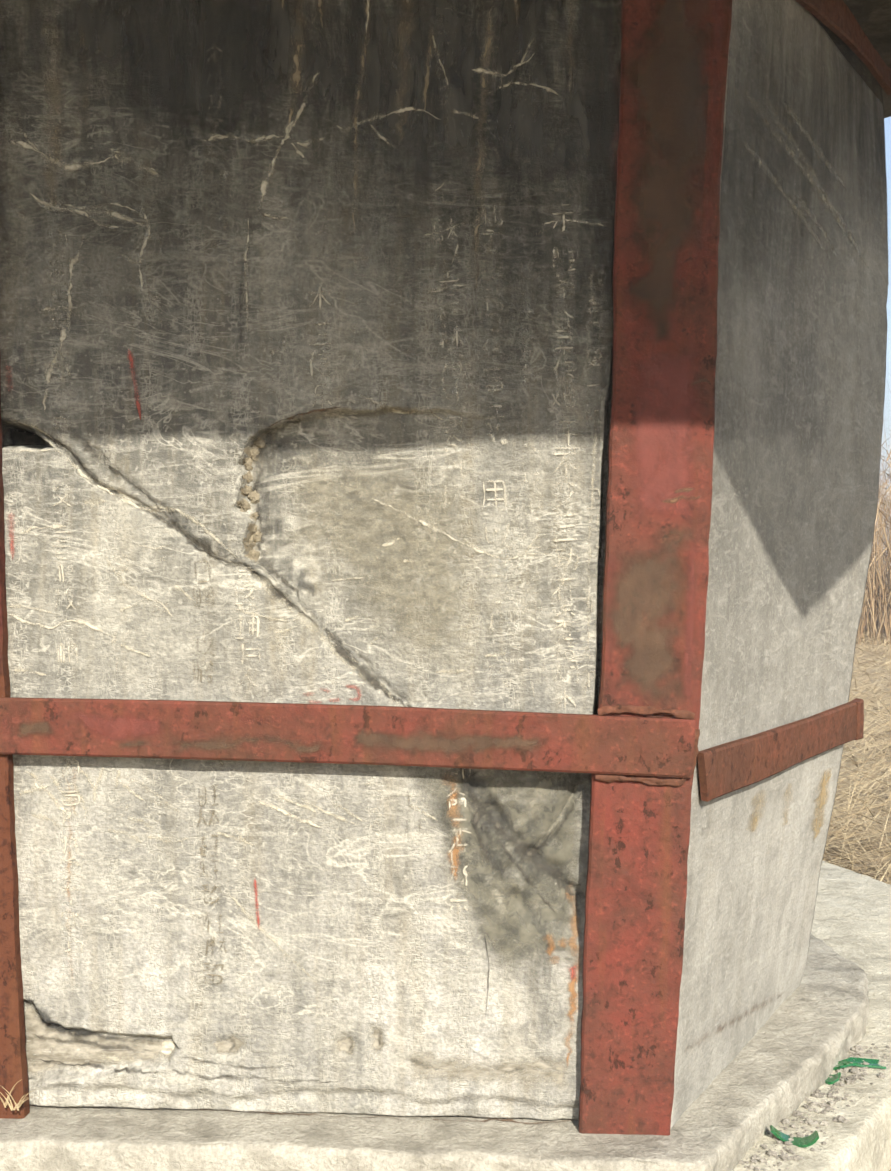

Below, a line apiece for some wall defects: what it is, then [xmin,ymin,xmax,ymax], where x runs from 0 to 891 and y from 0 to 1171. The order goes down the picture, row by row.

crack [30,428,403,704]
water stain [424,773,584,959]
rust [814,772,831,838]